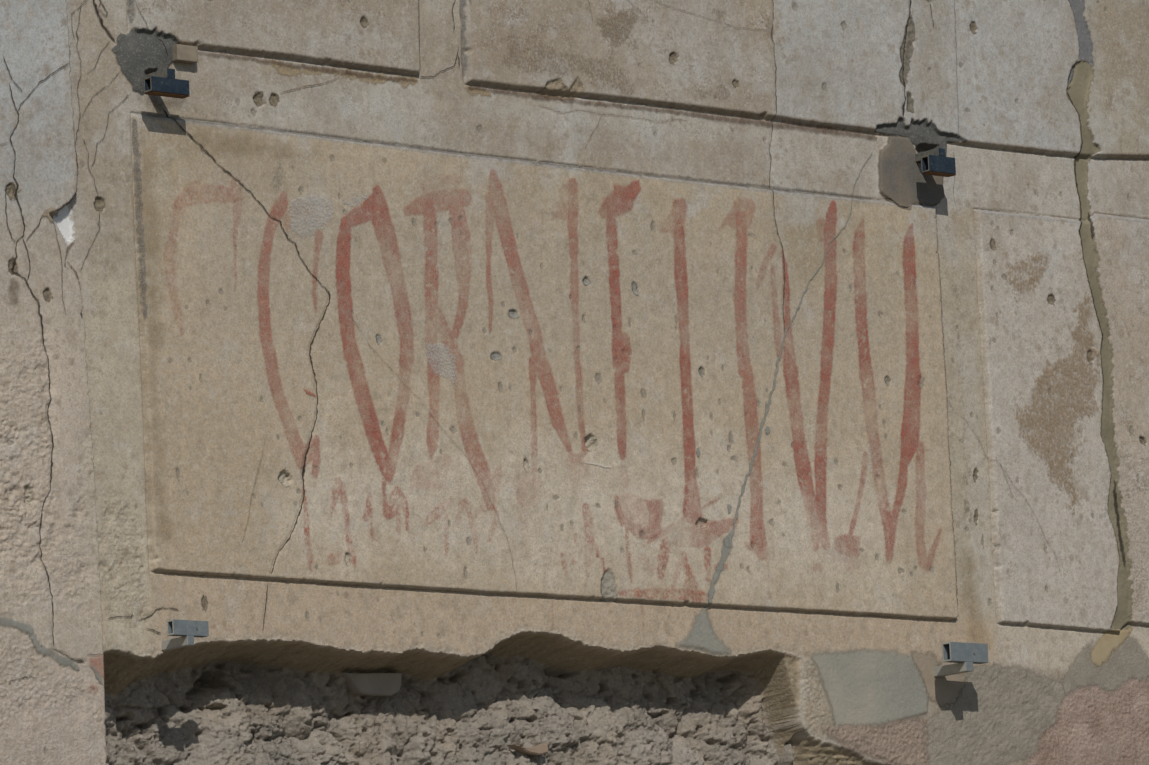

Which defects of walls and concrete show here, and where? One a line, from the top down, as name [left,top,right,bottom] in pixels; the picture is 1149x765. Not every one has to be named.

crack [902,0,934,117]
flaking render [43,204,75,246]
crack [3,0,128,663]
crack [163,109,330,627]
crack [706,3,873,609]
leakage [1016,296,1102,509]
crack [1067,0,1134,630]
crack [108,607,179,633]
flaking render [824,718,929,765]